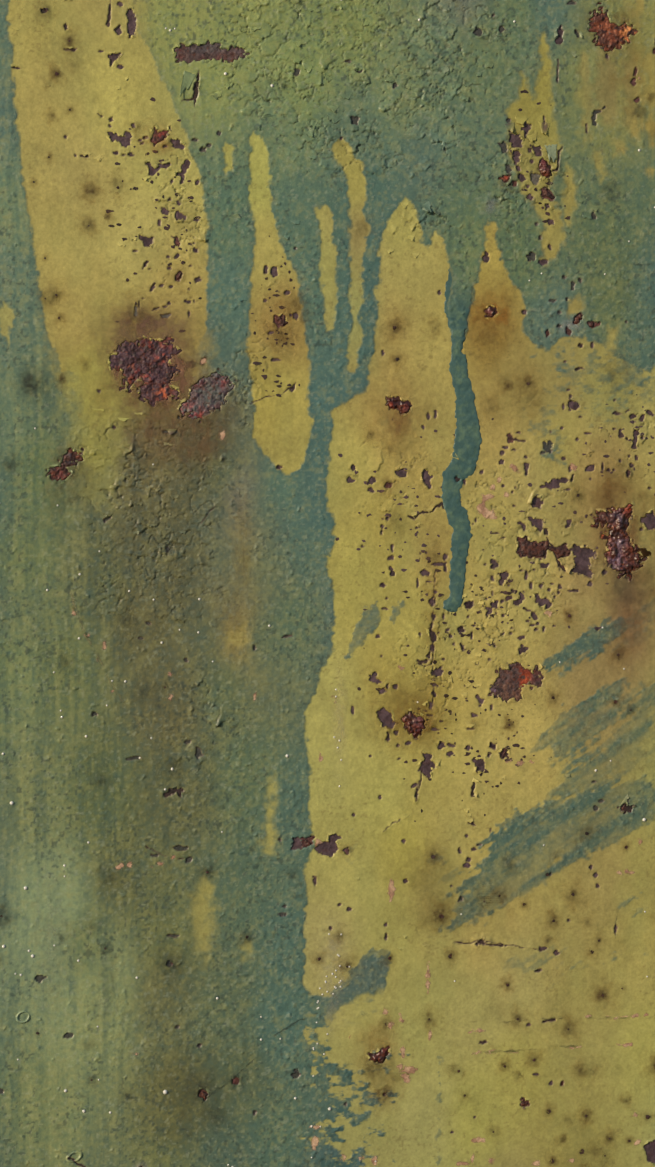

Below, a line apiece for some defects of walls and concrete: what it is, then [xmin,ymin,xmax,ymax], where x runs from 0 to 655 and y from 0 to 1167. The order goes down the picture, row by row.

peeling [107,2,136,39]
rust [588,3,638,51]
peeling [99,50,129,80]
peeling [498,90,571,233]
rust [107,316,236,439]
rust [46,447,86,484]
rust [591,481,647,584]
peeling [338,394,655,868]
rust [488,659,544,702]
rust [401,708,433,740]
peeling [279,831,349,856]
peeling [643,1138,655,1167]